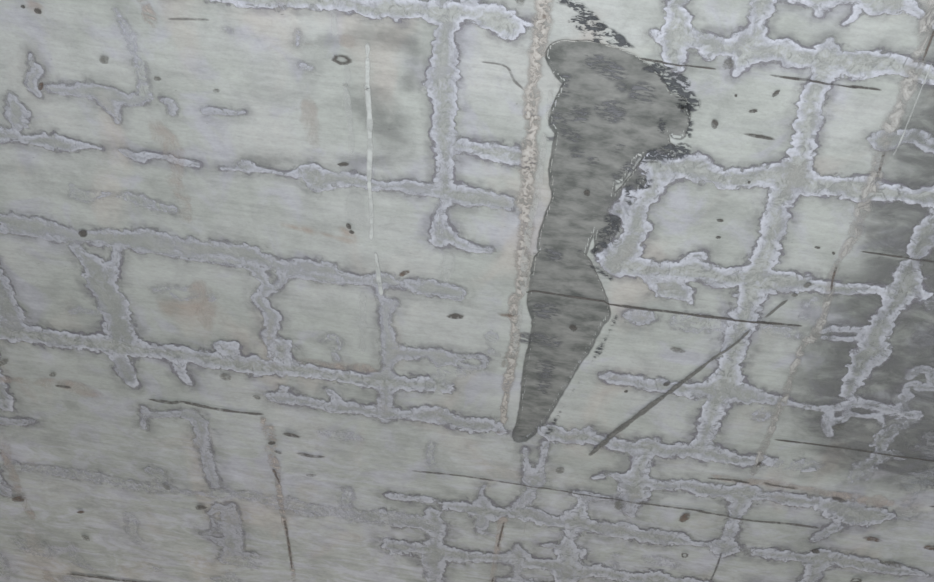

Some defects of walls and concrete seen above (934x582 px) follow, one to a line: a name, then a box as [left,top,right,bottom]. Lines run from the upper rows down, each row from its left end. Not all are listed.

crack [640,58,715,69]
damp [23,52,179,124]
crack [773,75,880,91]
crack [863,251,934,263]
crack [527,290,801,326]
crack [150,399,262,415]
crack [777,440,934,462]
damp [0,406,258,567]
crack [422,471,818,528]
crack [71,574,136,582]